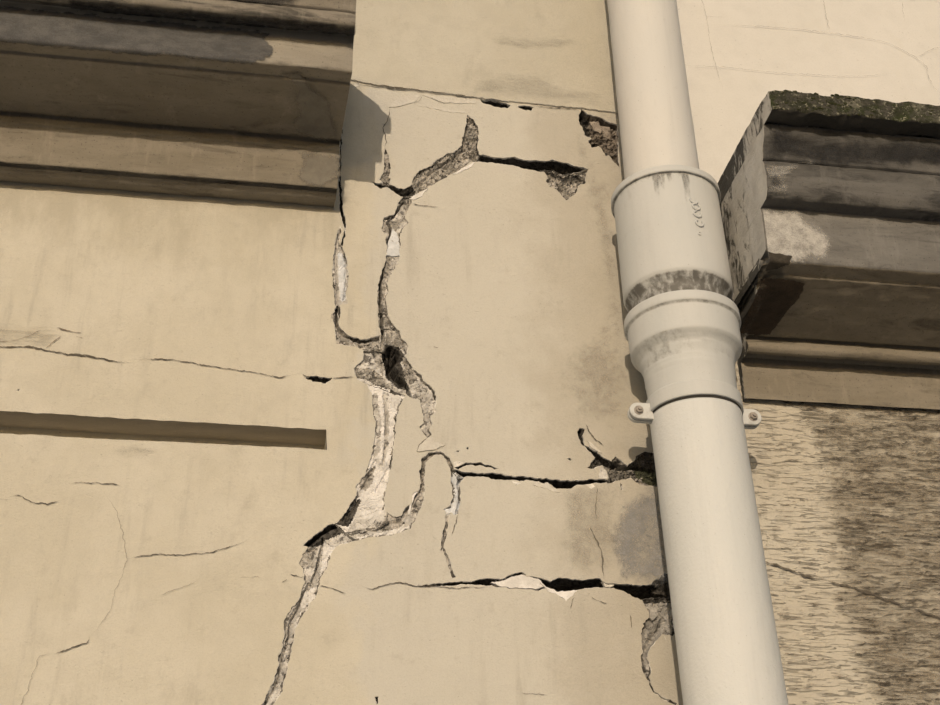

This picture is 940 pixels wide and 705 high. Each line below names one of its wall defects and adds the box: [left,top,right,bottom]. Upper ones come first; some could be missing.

crack [7,346,124,363]
crack [137,82,671,705]
damp [783,401,940,705]